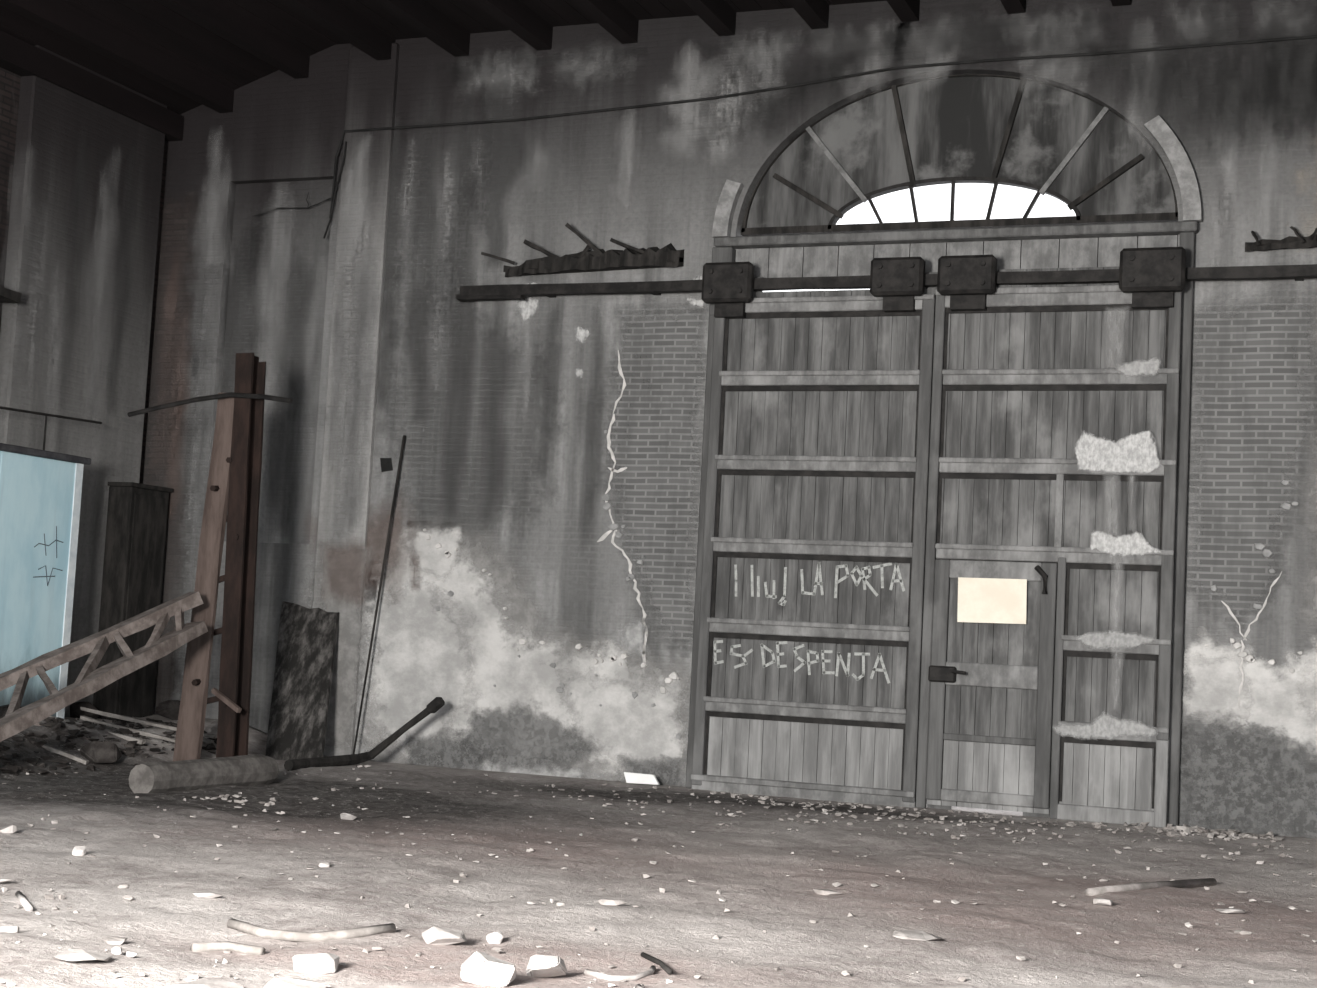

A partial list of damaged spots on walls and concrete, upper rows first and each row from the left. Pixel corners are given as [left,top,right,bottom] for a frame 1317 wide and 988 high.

leakage [518,282,538,321]
leakage [577,327,589,342]
leakage [1117,359,1160,376]
leakage [1075,431,1160,473]
crack [597,350,648,674]
peeling [354,521,688,781]
crack [1221,571,1282,710]
leakage [1180,725,1317,839]